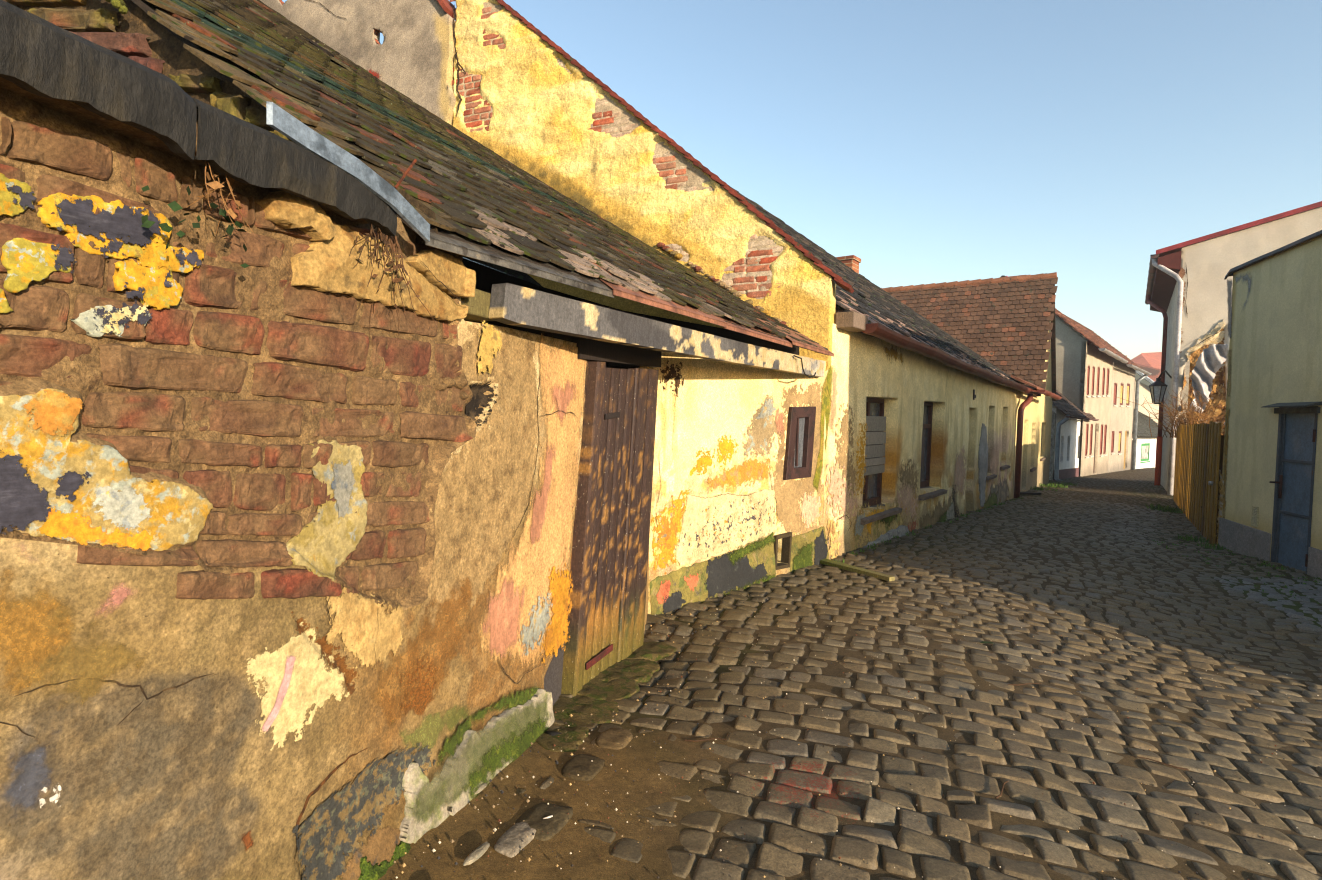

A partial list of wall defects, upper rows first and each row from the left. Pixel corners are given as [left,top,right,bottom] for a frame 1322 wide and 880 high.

flaking render [452,67,493,132]
flaking render [588,90,641,138]
flaking render [652,140,714,192]
flaking render [721,234,784,299]
flaking render [0,88,586,750]
peeling [650,382,919,615]